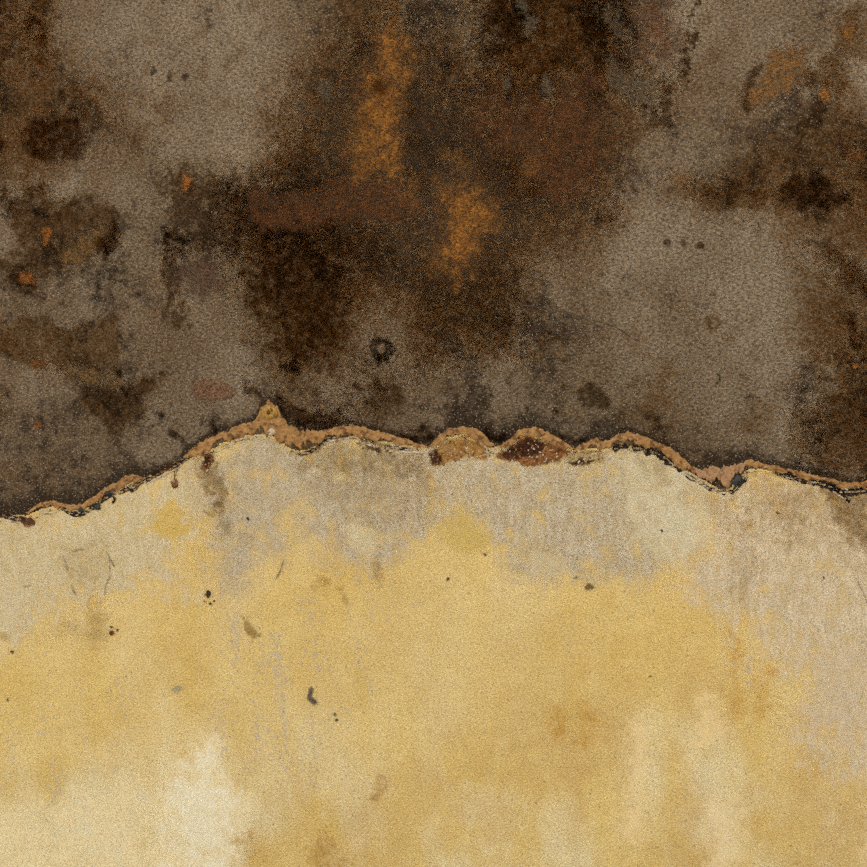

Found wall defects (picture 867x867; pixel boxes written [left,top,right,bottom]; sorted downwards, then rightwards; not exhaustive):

water stain [27,118,83,159]
corrosion [351,23,414,183]
water stain [0,187,115,286]
corrosion [435,183,499,286]
water stain [782,176,850,209]
peeling [0,399,867,782]